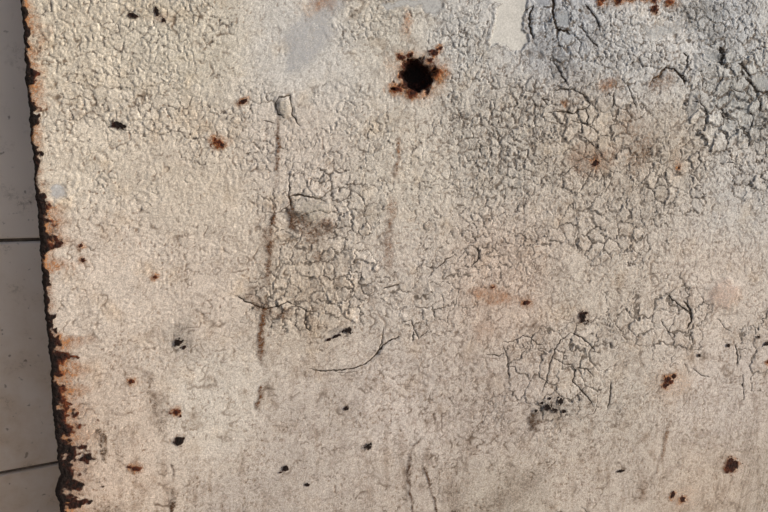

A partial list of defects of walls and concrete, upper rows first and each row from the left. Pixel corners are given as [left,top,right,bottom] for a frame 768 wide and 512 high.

corrosion [642,0,674,14]
corrosion [390,46,446,99]
crack [523,0,612,188]
crack [612,46,768,126]
peeling [338,0,768,323]
crack [288,173,328,218]
corrosion [20,0,104,512]
crack [661,293,693,336]
crack [310,320,427,373]
crack [487,333,612,408]
corrosion [661,373,688,393]
corrosion [723,456,743,476]